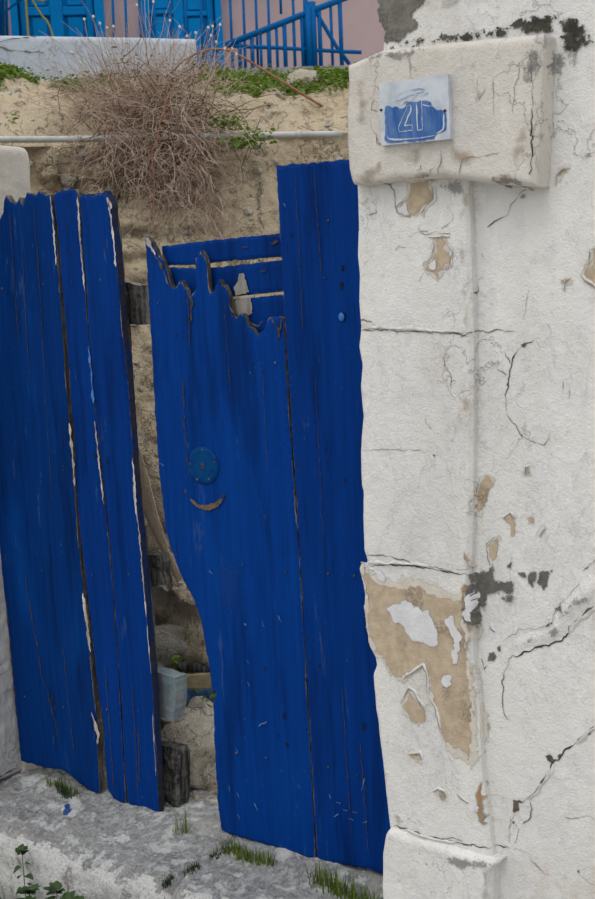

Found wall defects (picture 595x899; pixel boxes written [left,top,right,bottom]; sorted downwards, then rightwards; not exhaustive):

crack [0,36,44,53]
peeling [377,0,424,44]
crack [477,51,534,227]
peeling [396,175,437,218]
peeling [422,234,453,281]
peeling [561,246,595,291]
crack [360,291,549,445]
peeling [469,474,495,517]
peeling [360,510,553,769]
crack [481,560,595,720]